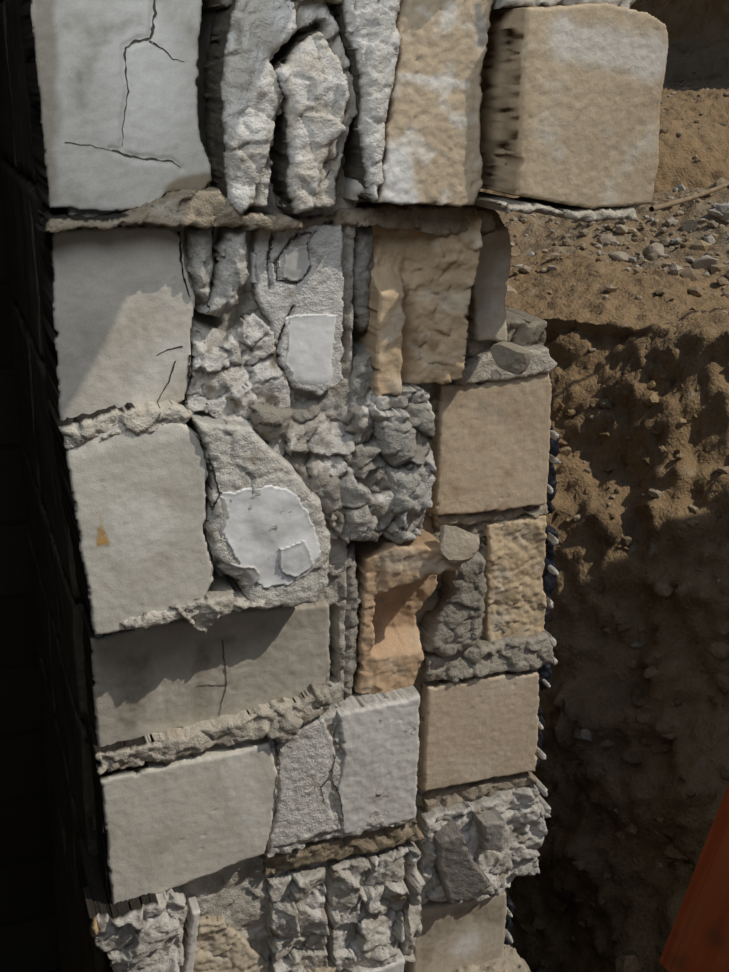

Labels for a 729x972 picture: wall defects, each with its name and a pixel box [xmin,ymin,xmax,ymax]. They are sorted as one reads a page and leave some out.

crack [65,0,184,168]
spalling [202,0,401,215]
spalling [184,226,257,316]
flaking render [281,244,311,281]
spalling [183,309,437,544]
peeling [203,485,321,589]
crack [196,640,227,715]